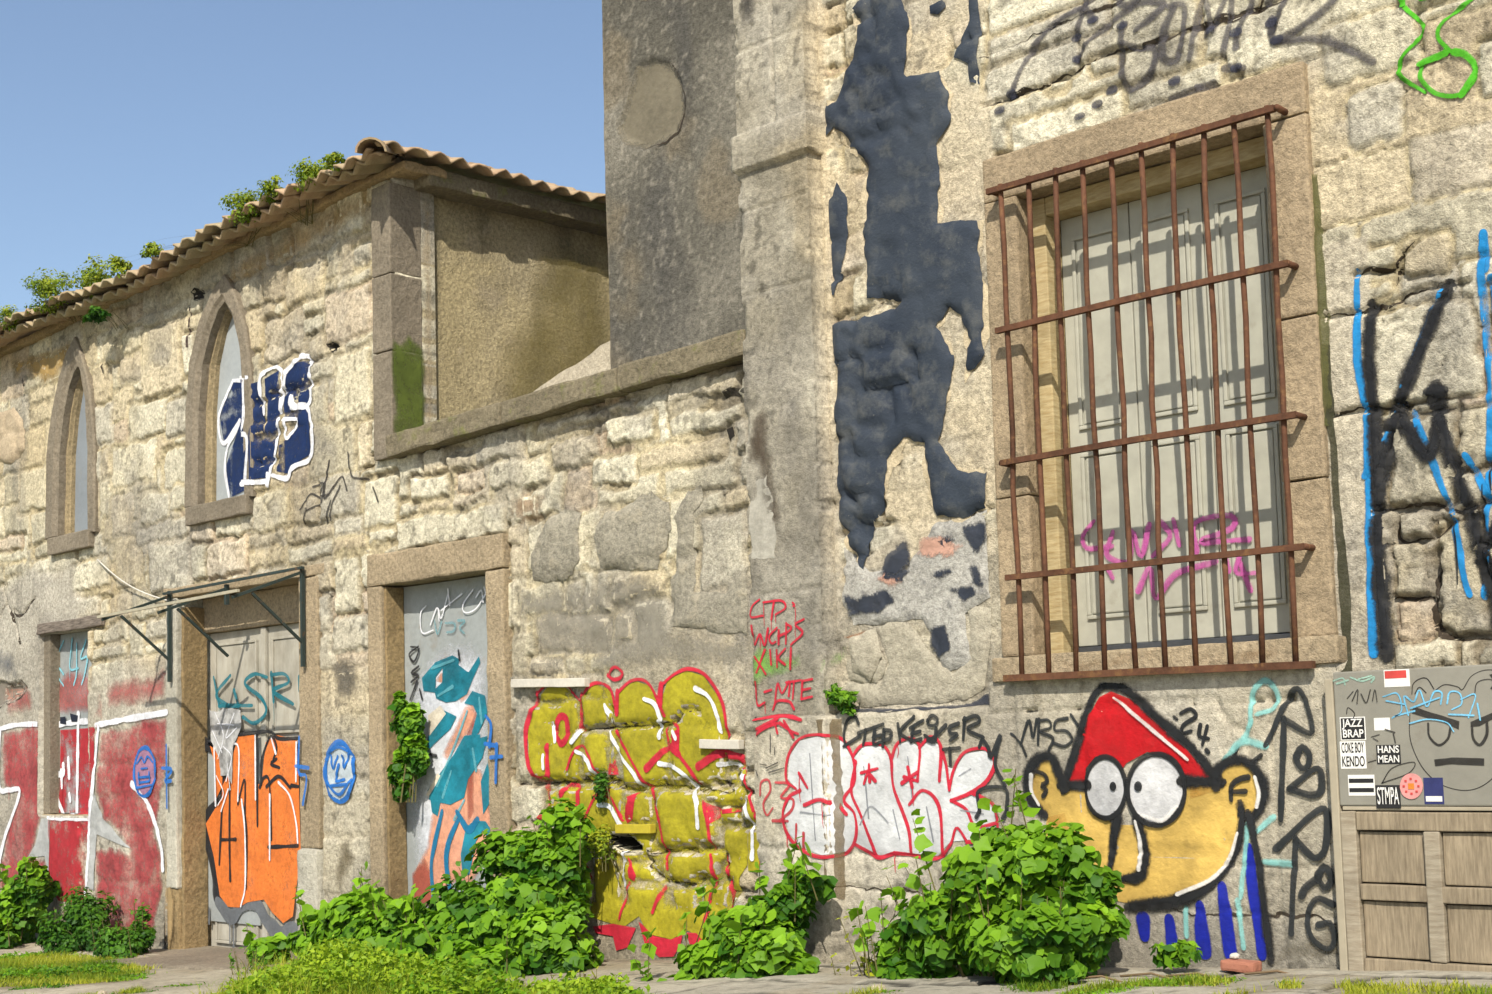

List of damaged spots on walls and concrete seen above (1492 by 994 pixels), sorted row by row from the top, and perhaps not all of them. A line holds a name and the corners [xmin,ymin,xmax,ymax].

spalling [0,680,28,708]
peeling [825,0,992,707]